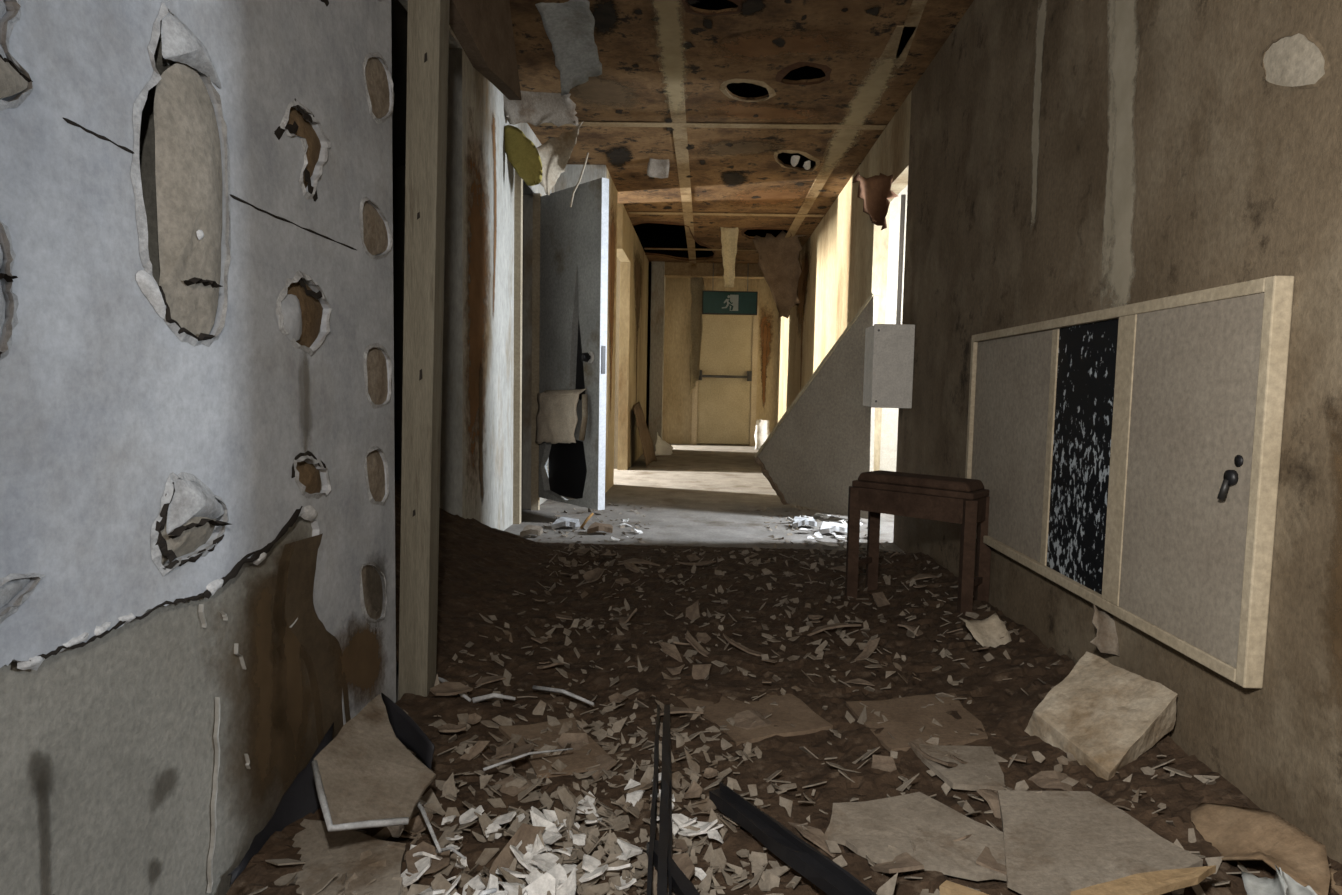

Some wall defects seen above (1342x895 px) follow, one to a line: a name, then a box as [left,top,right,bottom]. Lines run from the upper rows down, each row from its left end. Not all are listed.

flaking render [0,0,34,111]
flaking render [130,2,231,347]
flaking render [274,99,331,202]
flaking render [0,221,19,360]
flaking render [150,472,231,576]
flaking render [0,573,46,624]
peeling [17,656,45,670]
peeling [60,613,135,652]
peeling [201,579,223,599]
damp [32,756,51,895]